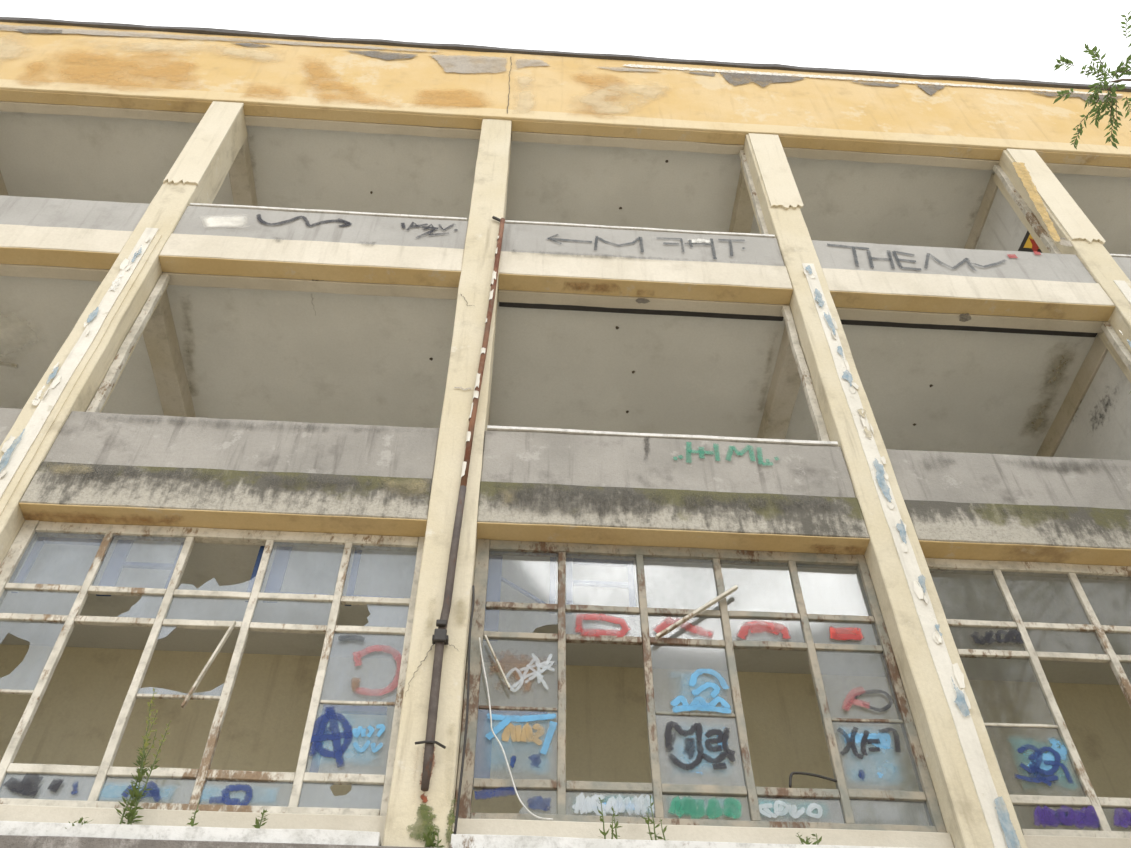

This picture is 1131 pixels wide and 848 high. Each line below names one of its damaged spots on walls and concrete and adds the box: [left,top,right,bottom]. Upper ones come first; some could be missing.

leakage [61,53,192,85]
peeling [804,265,859,394]
peeling [32,362,61,406]
peeling [0,429,25,478]
leakage [517,489,656,513]
peeling [873,456,908,552]
peeling [913,575,928,604]
peeling [951,663,971,716]
peeling [995,796,1020,848]